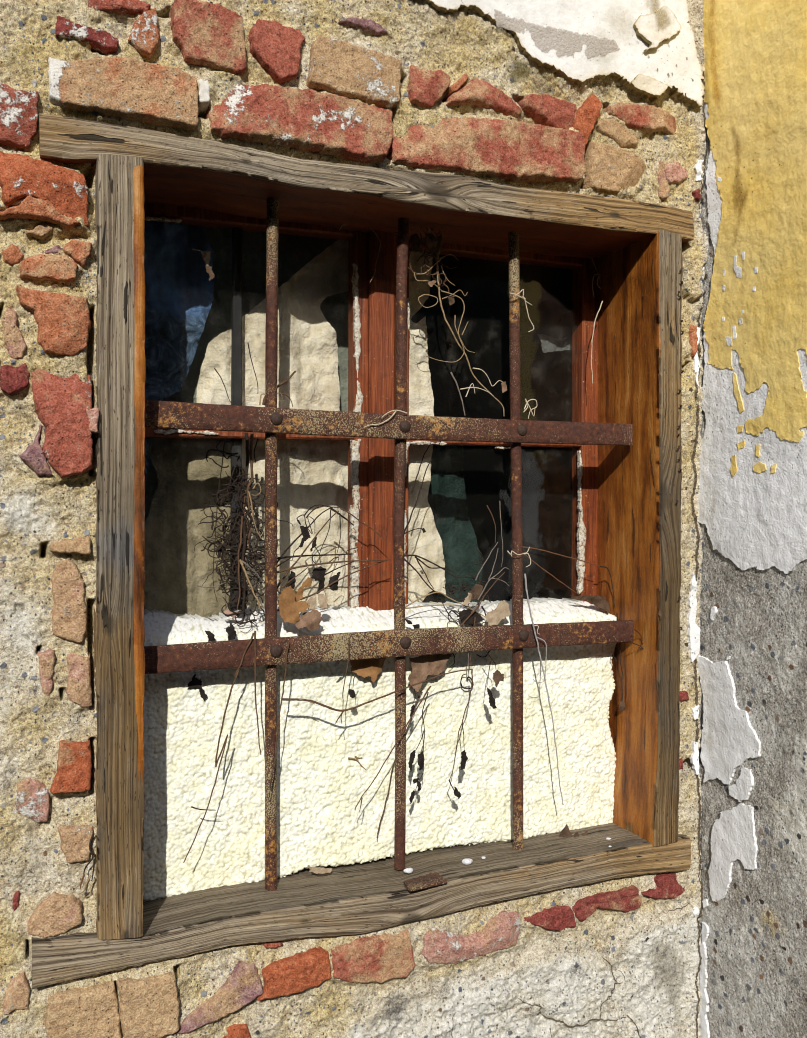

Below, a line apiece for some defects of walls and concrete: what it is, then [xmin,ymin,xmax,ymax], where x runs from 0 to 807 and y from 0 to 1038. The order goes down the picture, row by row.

peeling [494,10,619,58]
peeling [633,0,705,66]
peeling [629,74,668,97]
peeling [694,160,703,181]
peeling [706,149,722,254]
peeling [725,318,743,346]
peeling [692,349,700,386]
peeling [698,329,807,543]
peeling [687,572,701,662]
peeling [690,741,700,775]
spalling [696,525,807,1038]
crack [518,958,641,1038]